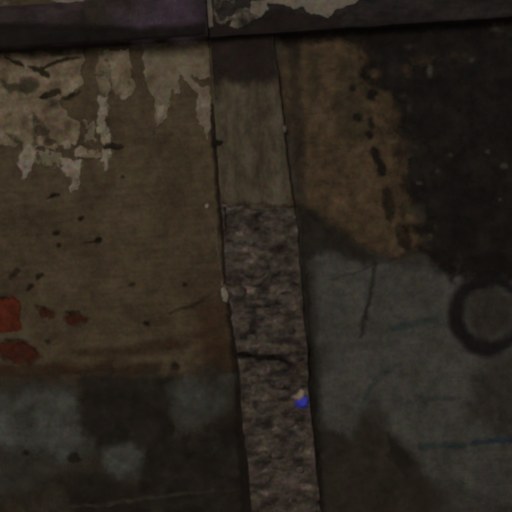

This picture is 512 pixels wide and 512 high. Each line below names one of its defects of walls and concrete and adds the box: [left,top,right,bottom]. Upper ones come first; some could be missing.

peeling [207,0,358,29]
peeling [0,48,137,193]
peeling [141,40,212,140]
crack [211,108,292,512]
leakage [210,10,512,512]
leakage [0,363,245,512]